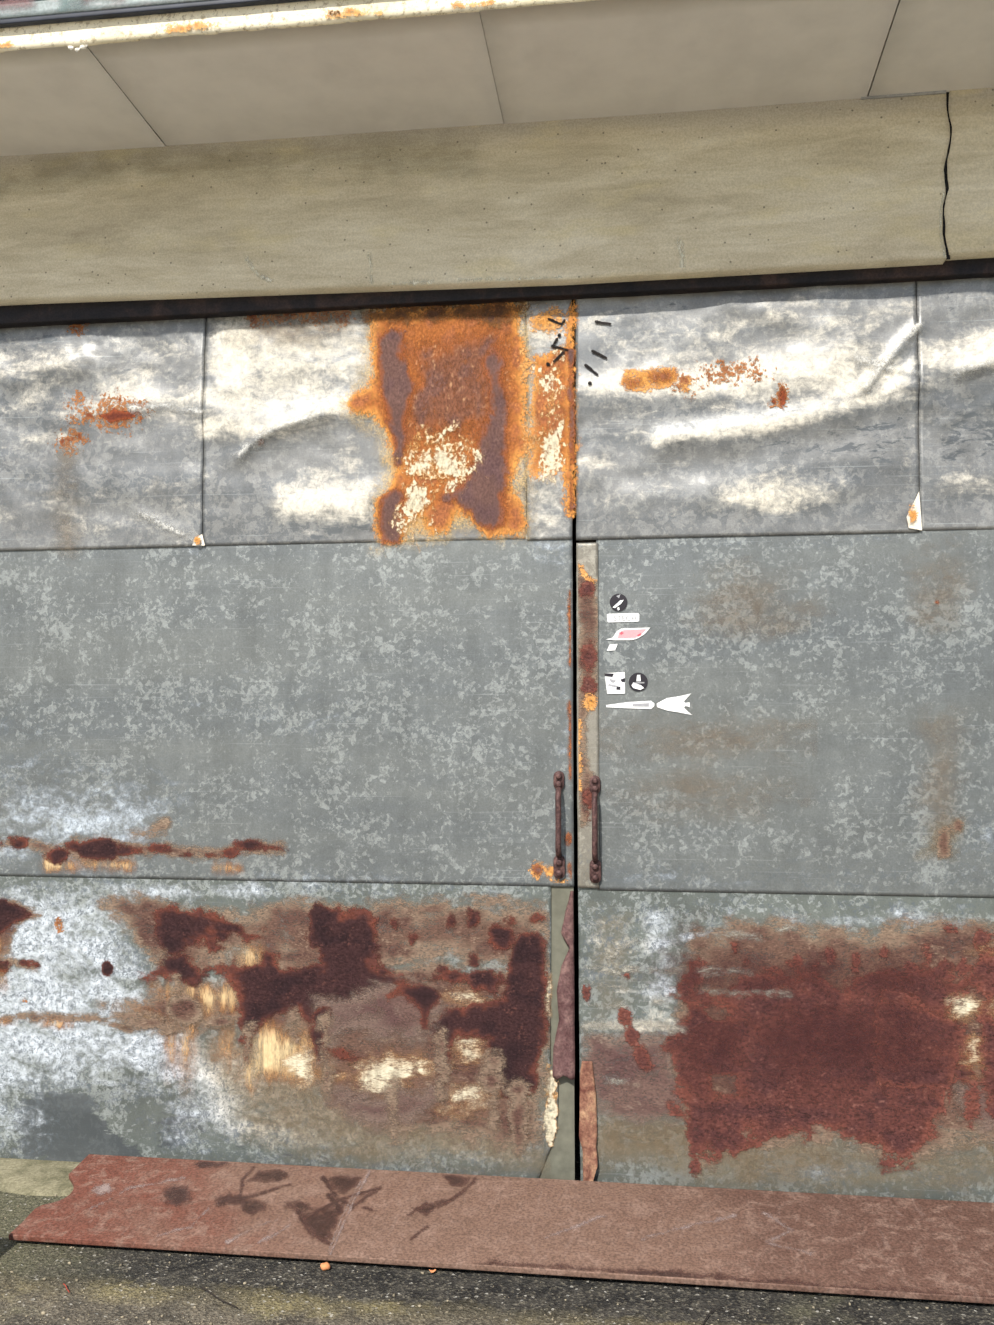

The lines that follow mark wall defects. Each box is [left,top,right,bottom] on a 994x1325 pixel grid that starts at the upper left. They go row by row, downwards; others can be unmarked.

rust [163,20,219,34]
rust [325,7,383,19]
rust [450,0,496,9]
crack [940,92,952,260]
rust [621,356,790,410]
rust [47,387,156,458]
rust [244,301,580,549]
rust [565,564,598,843]
rust [0,817,286,871]
rust [528,860,572,883]
rust [0,891,550,1155]
rust [581,916,994,1178]